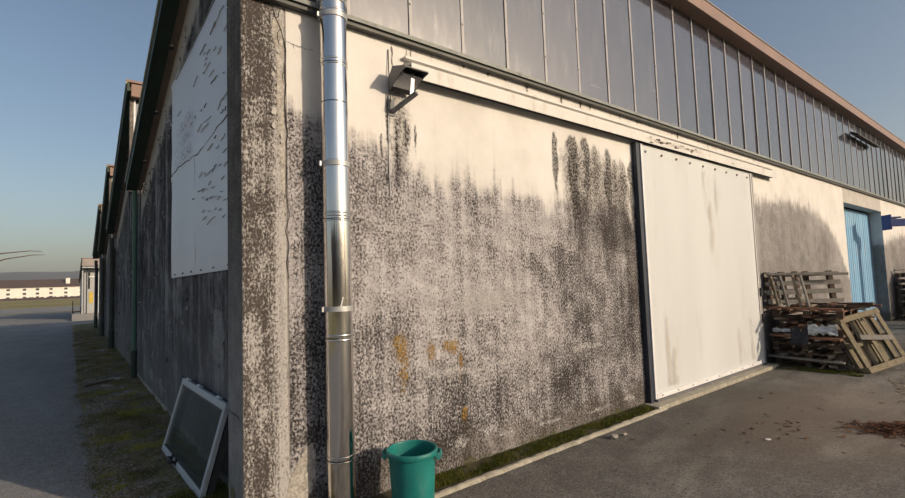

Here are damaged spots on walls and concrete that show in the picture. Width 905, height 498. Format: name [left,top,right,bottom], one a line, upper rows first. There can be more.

leakage [380,92,417,175]
leakage [552,133,634,245]
corrosion [427,341,463,376]
leakage [427,350,544,378]